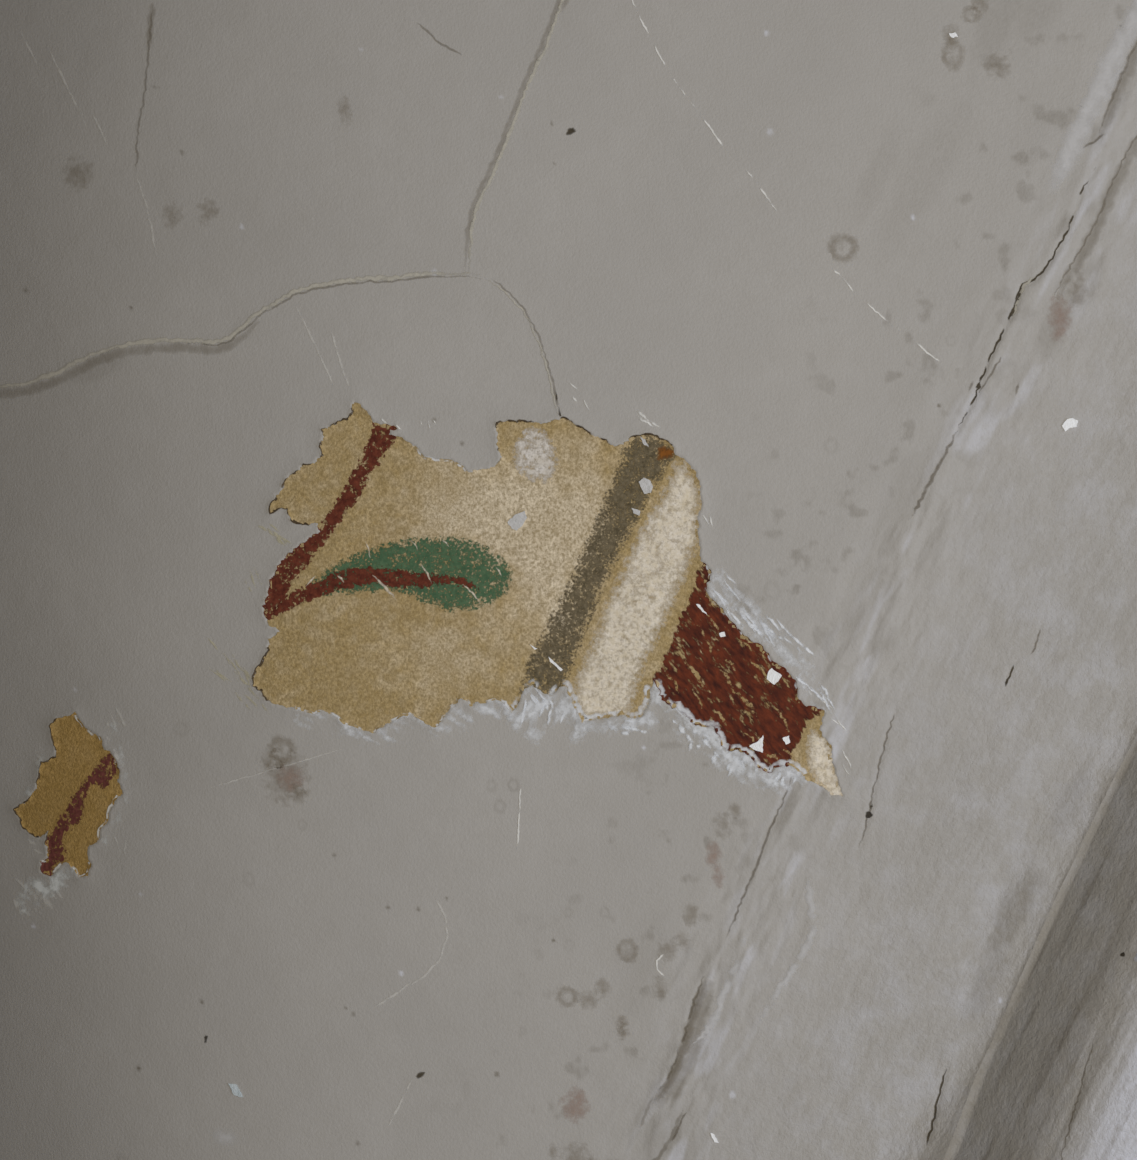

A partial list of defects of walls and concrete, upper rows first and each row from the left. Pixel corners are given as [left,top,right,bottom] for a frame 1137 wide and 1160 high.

crack [0,0,564,388]
peeling [214,402,851,796]
peeling [13,712,123,912]